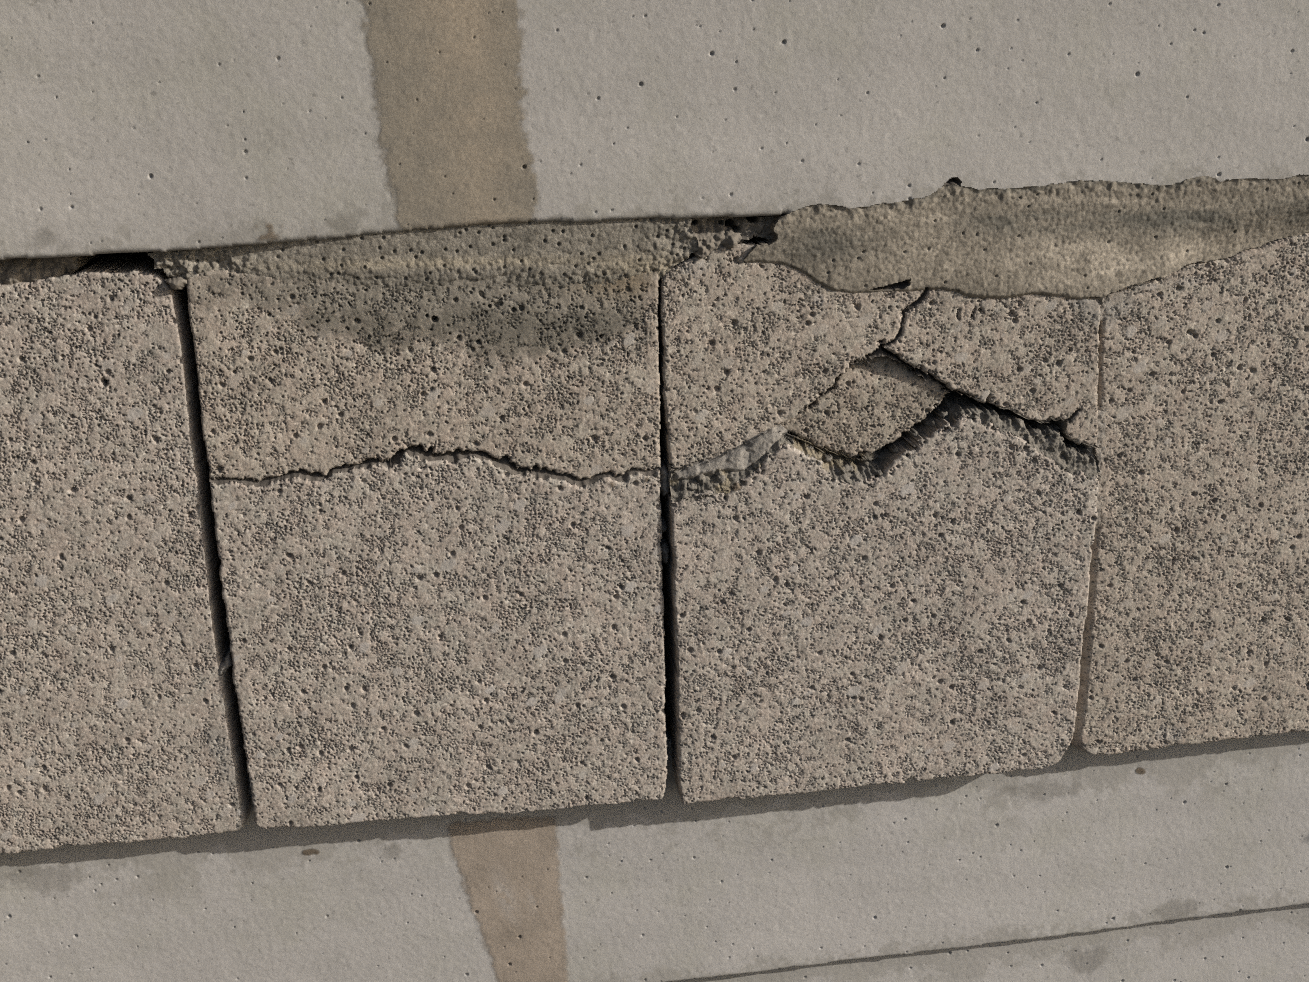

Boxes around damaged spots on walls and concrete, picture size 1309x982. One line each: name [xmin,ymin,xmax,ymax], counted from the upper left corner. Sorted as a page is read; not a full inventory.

spalling [943,177,962,186]
peeling [872,280,909,291]
water stain [235,272,651,357]
crack [780,287,955,424]
crack [1064,409,1080,423]
crack [210,444,661,487]
spalling [670,390,1101,506]